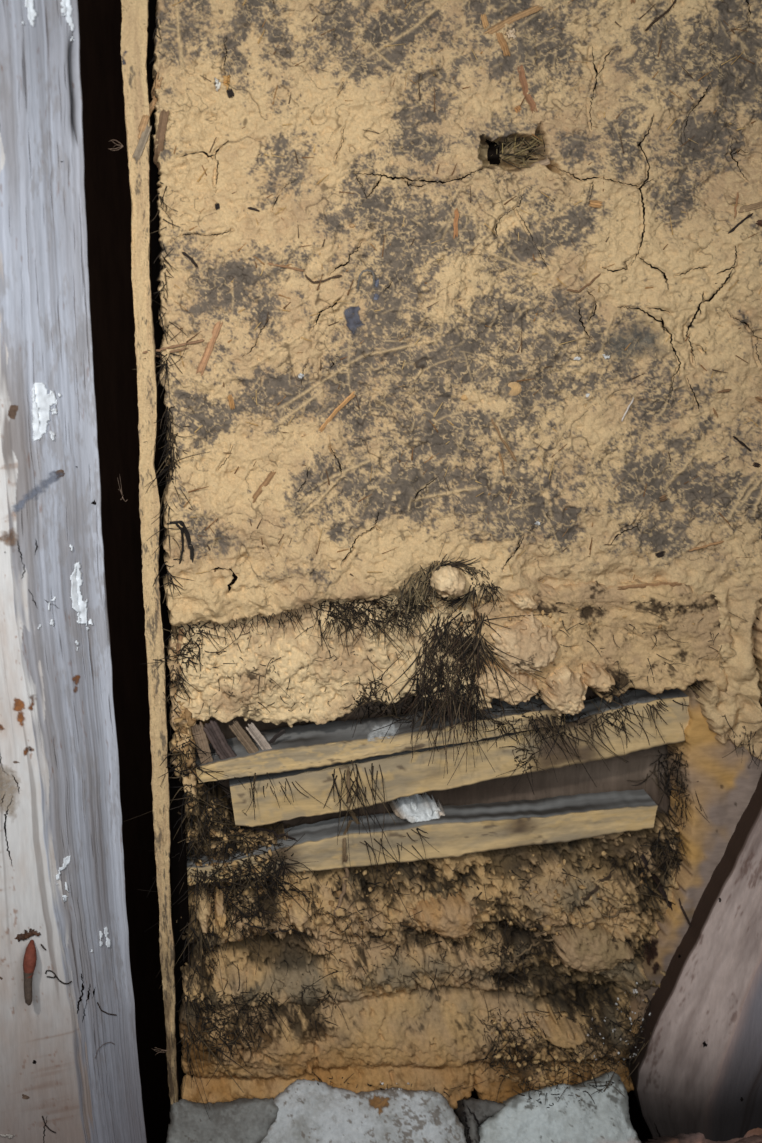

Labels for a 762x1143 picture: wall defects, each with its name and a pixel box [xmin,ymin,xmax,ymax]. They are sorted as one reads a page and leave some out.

peeling [21,0,37,26]
crack [334,122,482,199]
crack [495,192,547,266]
crack [551,119,762,409]
peeling [31,382,62,441]
peeling [69,544,93,631]
rust [14,697,34,726]
spalling [167,579,733,861]
rust [15,928,41,942]
spalling [176,809,682,1110]